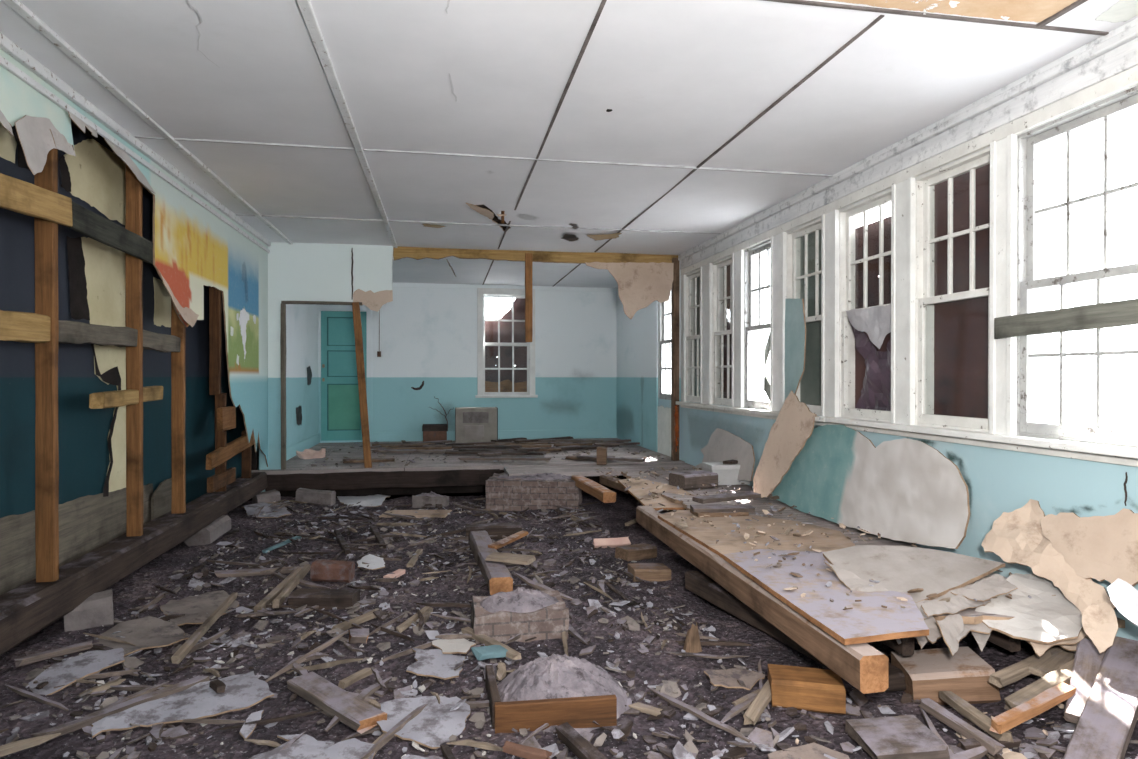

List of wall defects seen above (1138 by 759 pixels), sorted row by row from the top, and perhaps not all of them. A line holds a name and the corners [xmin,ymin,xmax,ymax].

peeling [826,0,1077,23]
peeling [50,129,76,156]
peeling [230,308,256,365]